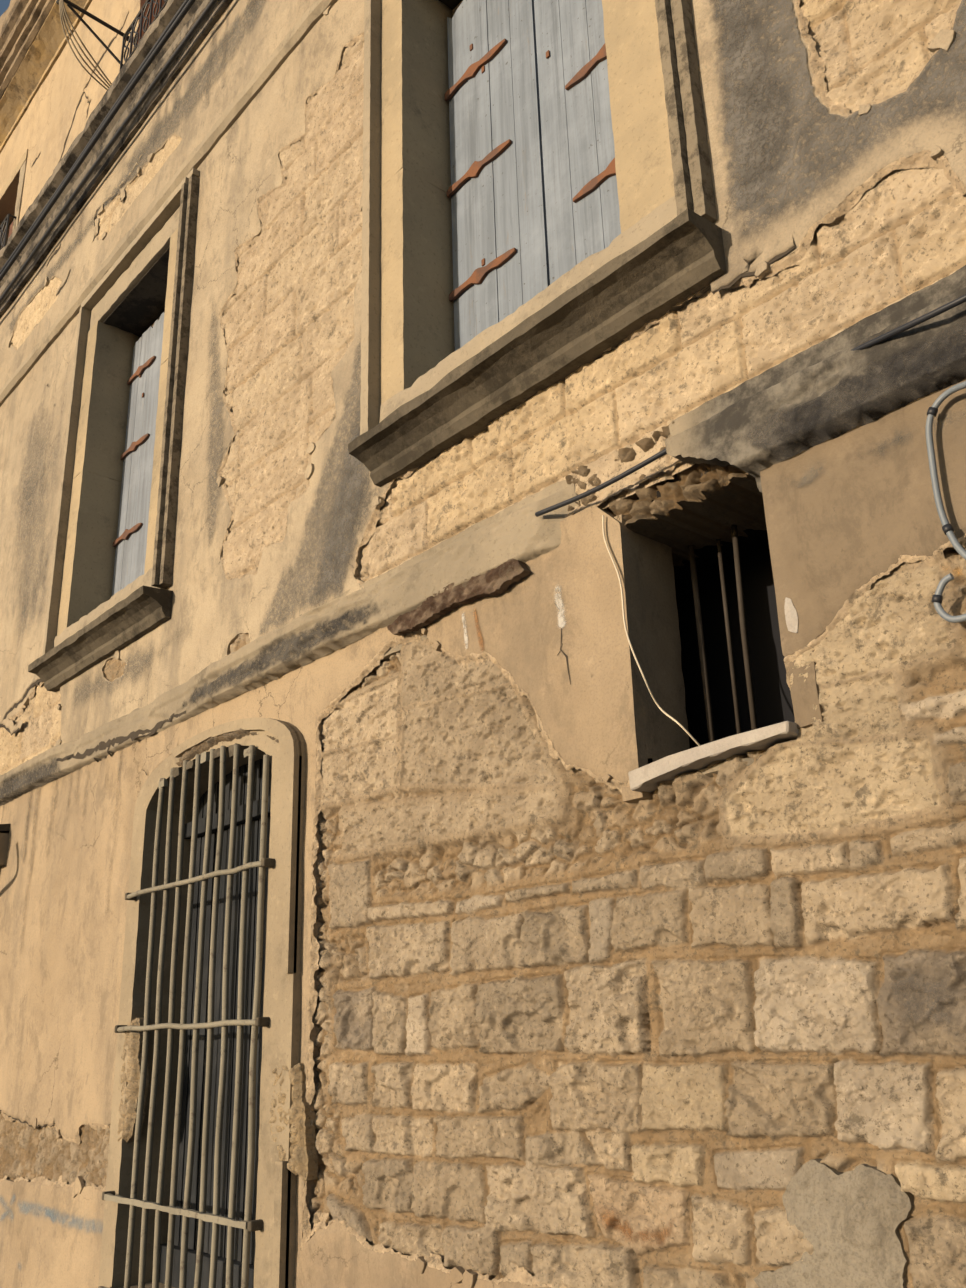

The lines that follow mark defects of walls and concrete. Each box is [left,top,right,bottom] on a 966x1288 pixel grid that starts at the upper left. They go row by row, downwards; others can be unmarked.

water stain [714,0,966,235]
spalling [794,0,962,117]
spalling [216,31,364,580]
spalling [354,145,966,589]
spalling [0,682,62,775]
spalling [269,534,966,1288]
spalling [0,1017,149,1198]